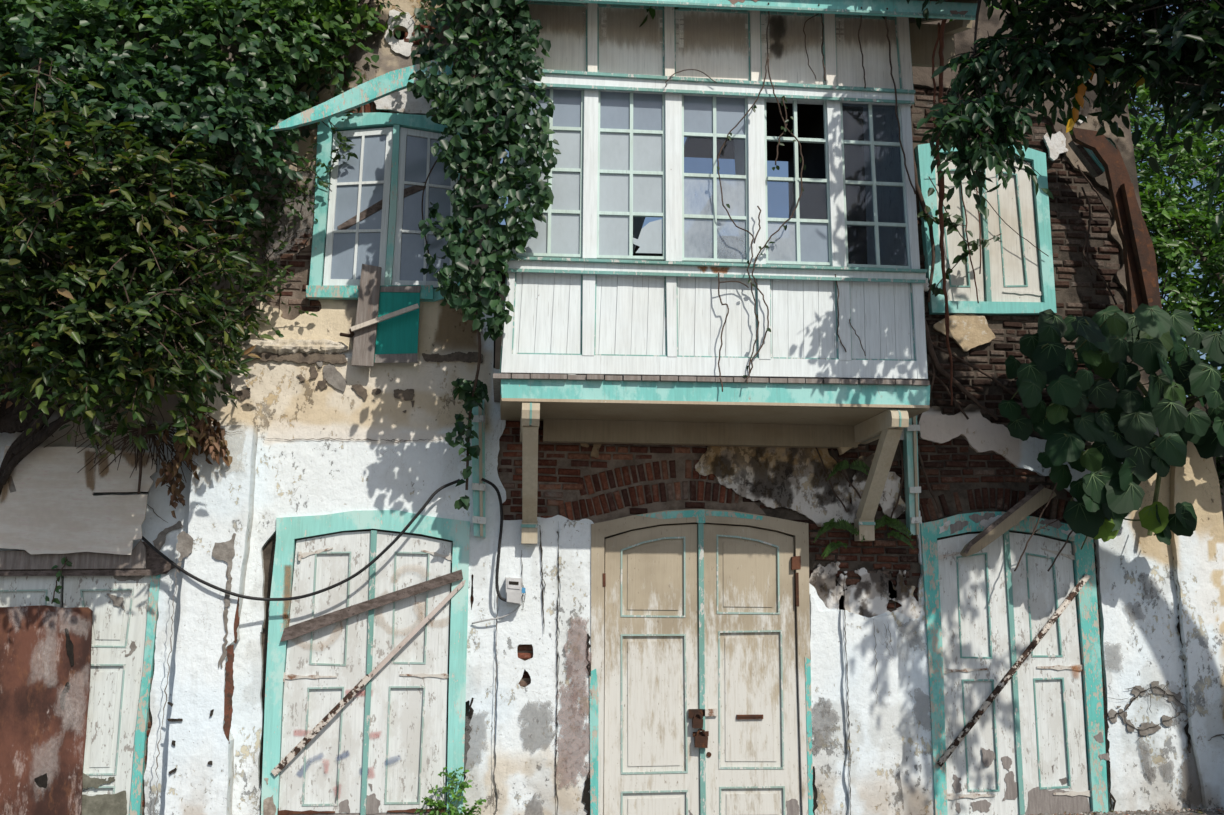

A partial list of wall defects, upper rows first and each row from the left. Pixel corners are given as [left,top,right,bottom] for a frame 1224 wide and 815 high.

flaking render [910,87,964,168]
flaking render [916,193,925,269]
flaking render [1015,117,1127,320]
spalling [246,352,414,413]
spalling [422,352,483,363]
flaking render [915,291,1046,440]
spalling [153,521,194,573]
flaking render [497,421,522,520]
flaking render [537,421,1076,619]
water stain [518,616,592,789]
crack [1093,539,1224,812]
water stain [523,792,545,815]